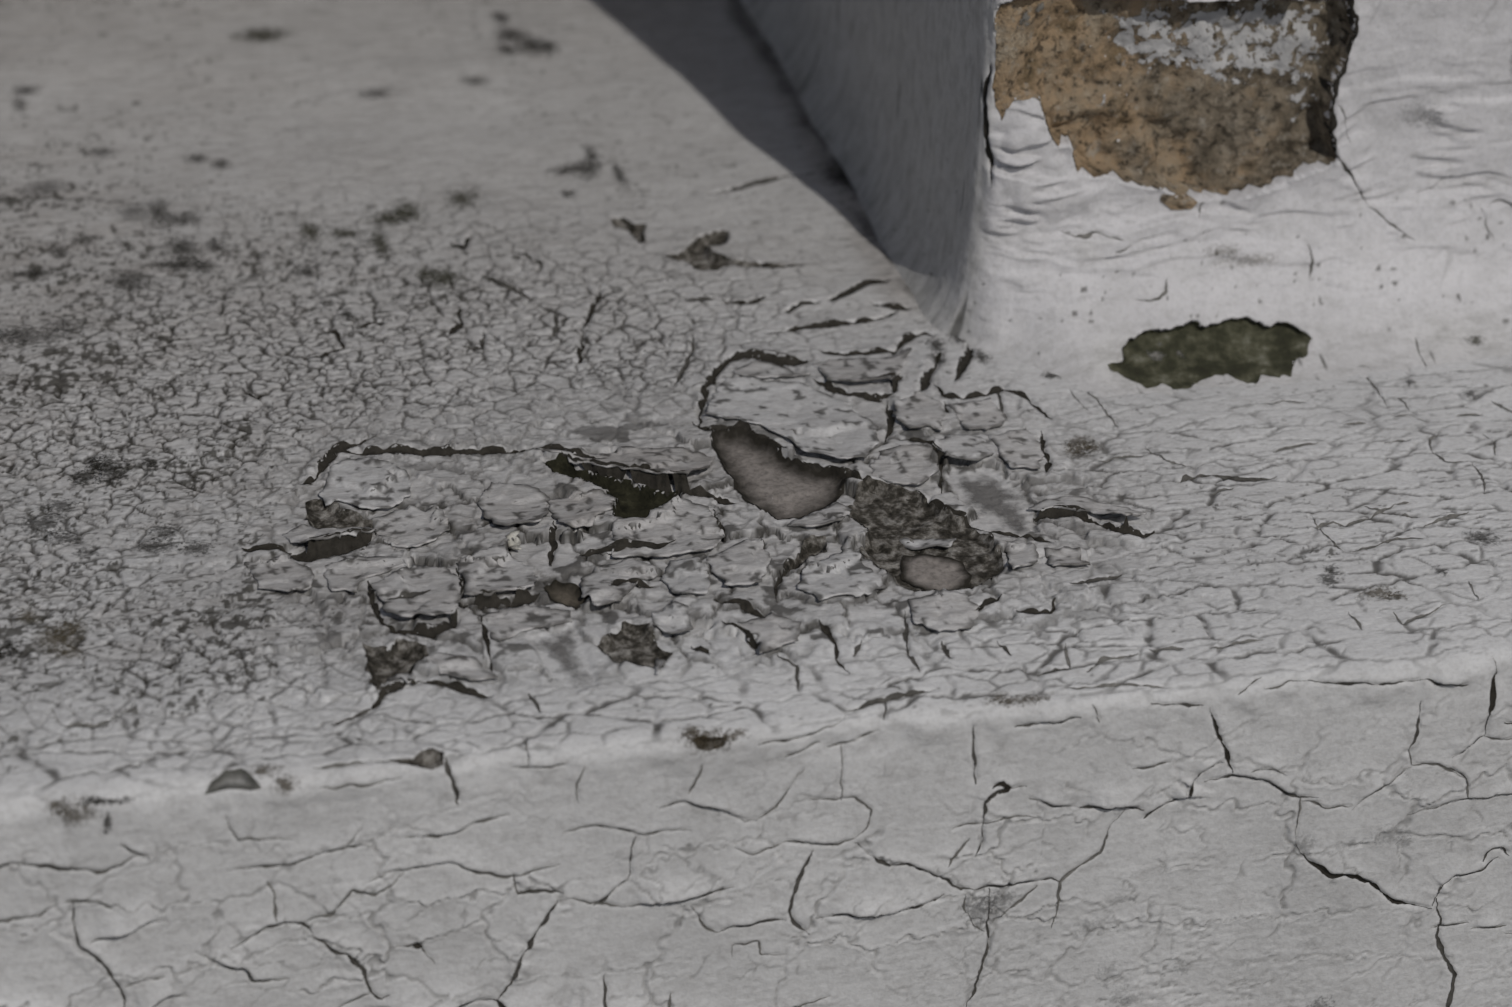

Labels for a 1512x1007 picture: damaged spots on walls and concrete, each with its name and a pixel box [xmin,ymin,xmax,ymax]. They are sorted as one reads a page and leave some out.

spalling [992,0,1354,210]
crack [307,322,385,359]
crack [446,234,601,364]
crack [707,172,816,195]
crack [676,279,1512,552]
crack [1062,231,1131,253]
spalling [1108,318,1312,390]
crack [303,436,735,542]
peeling [244,348,1147,677]
peeling [361,638,499,690]
crack [196,521,1512,1007]
crack [0,845,184,1007]